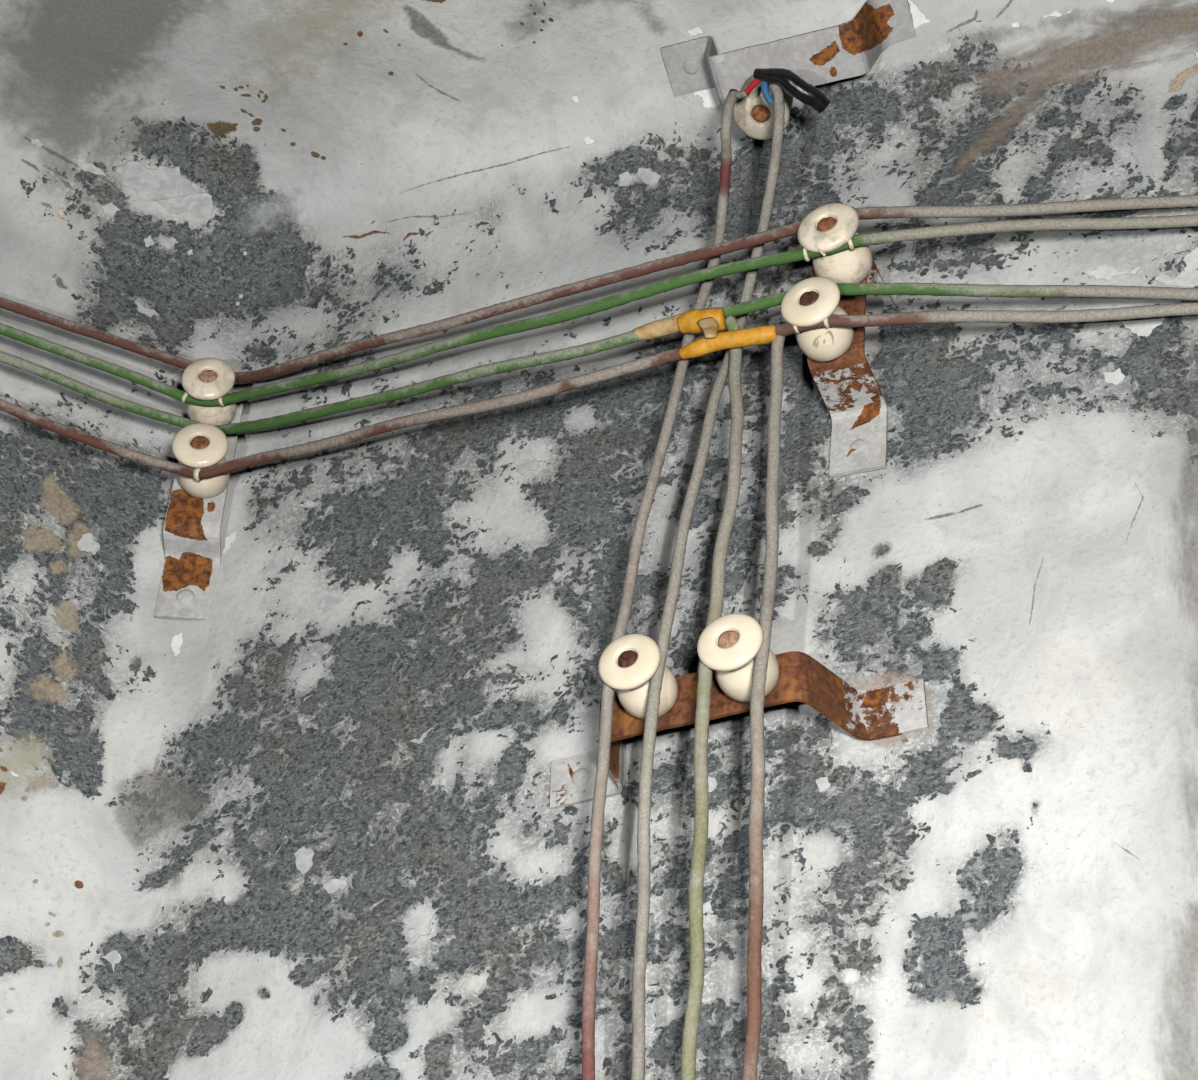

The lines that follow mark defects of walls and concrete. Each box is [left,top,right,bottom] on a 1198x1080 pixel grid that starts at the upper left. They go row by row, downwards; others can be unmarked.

leakage [5,0,186,157]
peeling [694,88,720,108]
rust [810,2,894,77]
leakage [570,6,1198,288]
spalling [1169,52,1198,92]
peeling [20,116,290,356]
rust [850,379,881,430]
leakage [865,295,1198,501]
rust [162,489,215,592]
peeling [171,633,184,657]
leakage [0,203,1051,1080]
rust [857,675,930,710]